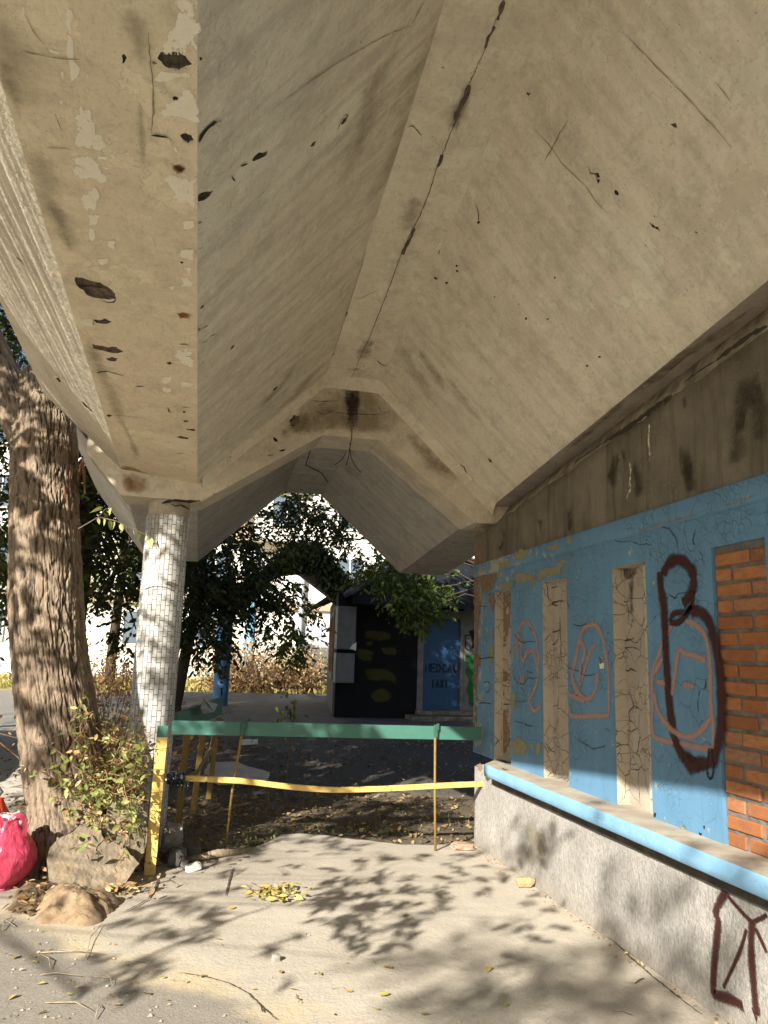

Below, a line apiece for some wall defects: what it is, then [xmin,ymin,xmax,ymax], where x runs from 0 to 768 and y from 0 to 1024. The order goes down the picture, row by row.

peeling [152,0,202,153]
crack [277,3,424,106]
crack [622,32,726,141]
peeling [71,104,115,265]
peeling [164,175,213,208]
crack [333,0,505,372]
crack [533,121,619,211]
spalling [75,277,116,303]
spalling [92,344,123,361]
water stain [293,391,378,429]
peeling [472,526,572,727]
crack [478,583,639,751]